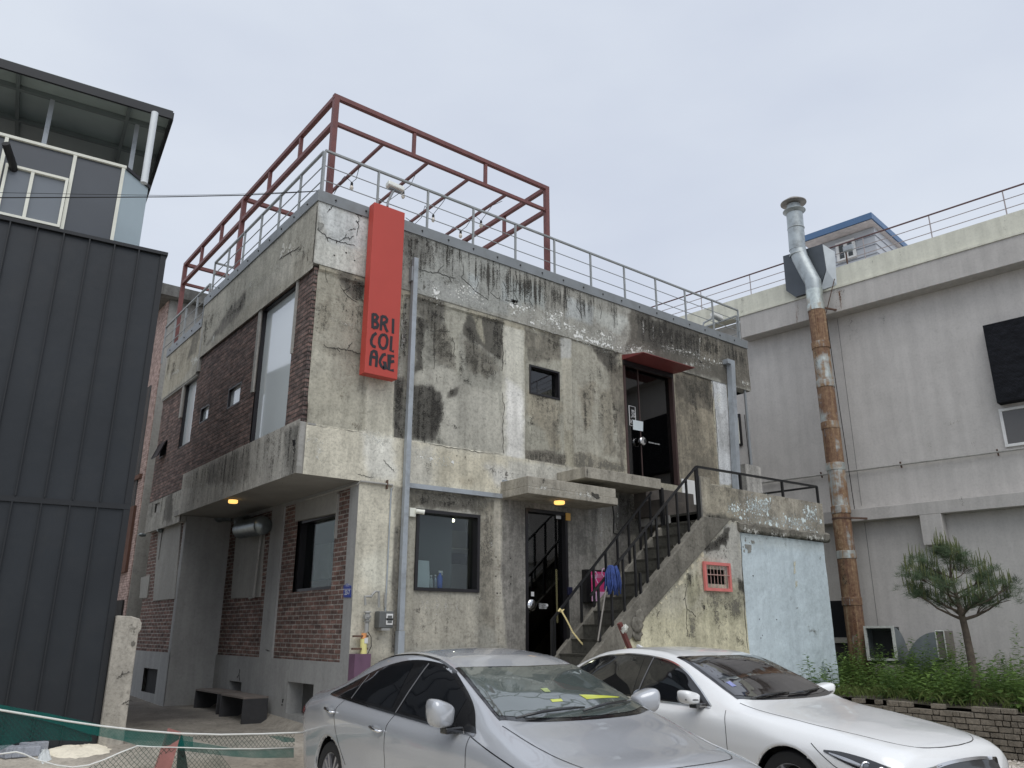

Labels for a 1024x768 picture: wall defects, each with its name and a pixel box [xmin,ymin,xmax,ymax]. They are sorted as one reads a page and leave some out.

crack [280,206,362,302]
water stain [394,234,594,445]
water stain [637,316,751,422]